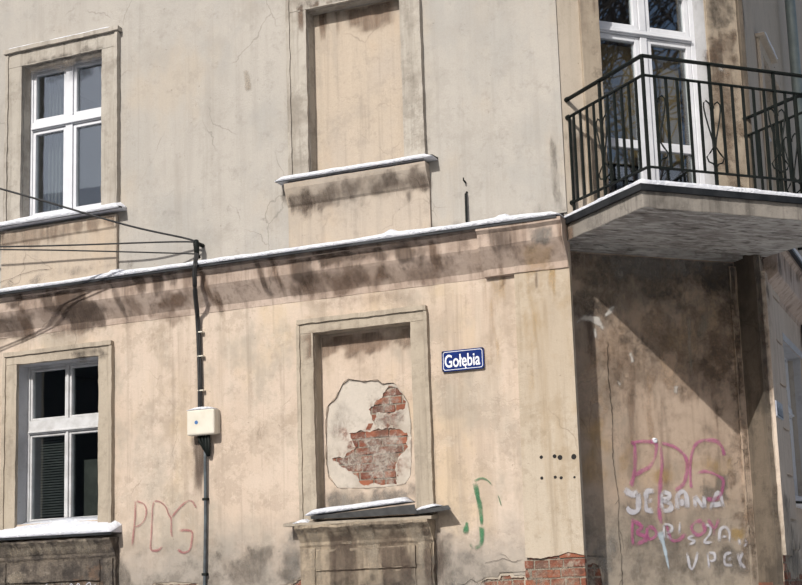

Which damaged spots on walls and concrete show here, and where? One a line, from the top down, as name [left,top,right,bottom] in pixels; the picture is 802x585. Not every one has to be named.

damp [41,289,105,329]
damp [135,275,162,291]
damp [159,295,185,309]
damp [198,268,219,305]
damp [294,242,439,292]
damp [587,302,607,344]
damp [323,333,384,355]
flaking render [325,379,412,489]
crack [607,347,623,582]
flaking render [478,551,605,585]
flaking render [782,555,802,585]